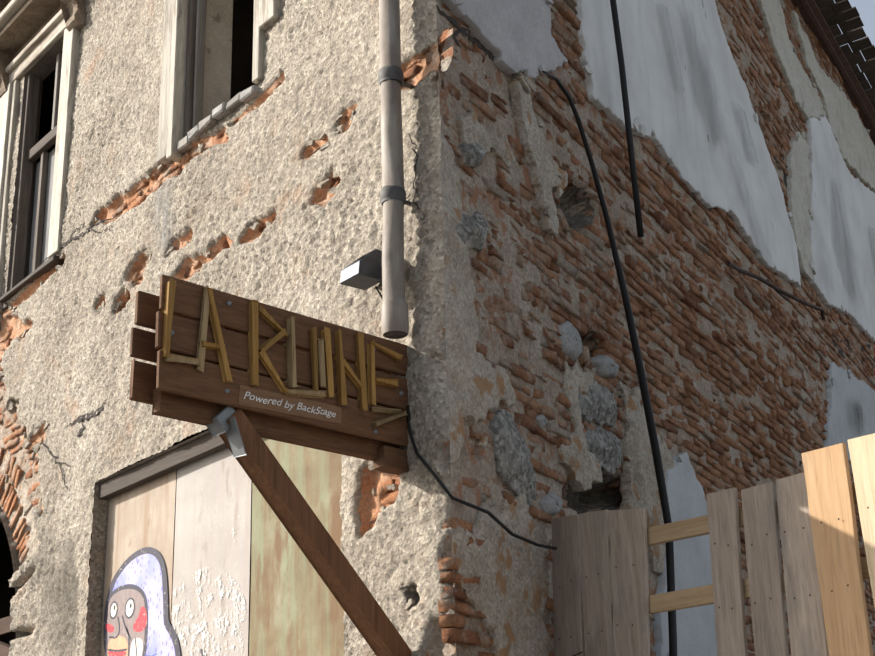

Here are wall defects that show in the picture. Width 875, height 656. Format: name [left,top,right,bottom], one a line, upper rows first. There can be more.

flaking render [93,72,285,226]
flaking render [401,0,599,237]
flaking render [574,0,875,342]
crack [37,216,116,267]
flaking render [0,254,66,516]
crack [69,402,105,437]
flaking render [823,362,875,461]
flaking render [357,460,400,537]
flaking render [663,452,708,522]
flaking render [425,516,494,656]
flaking render [655,534,713,594]
flaking render [653,604,717,656]